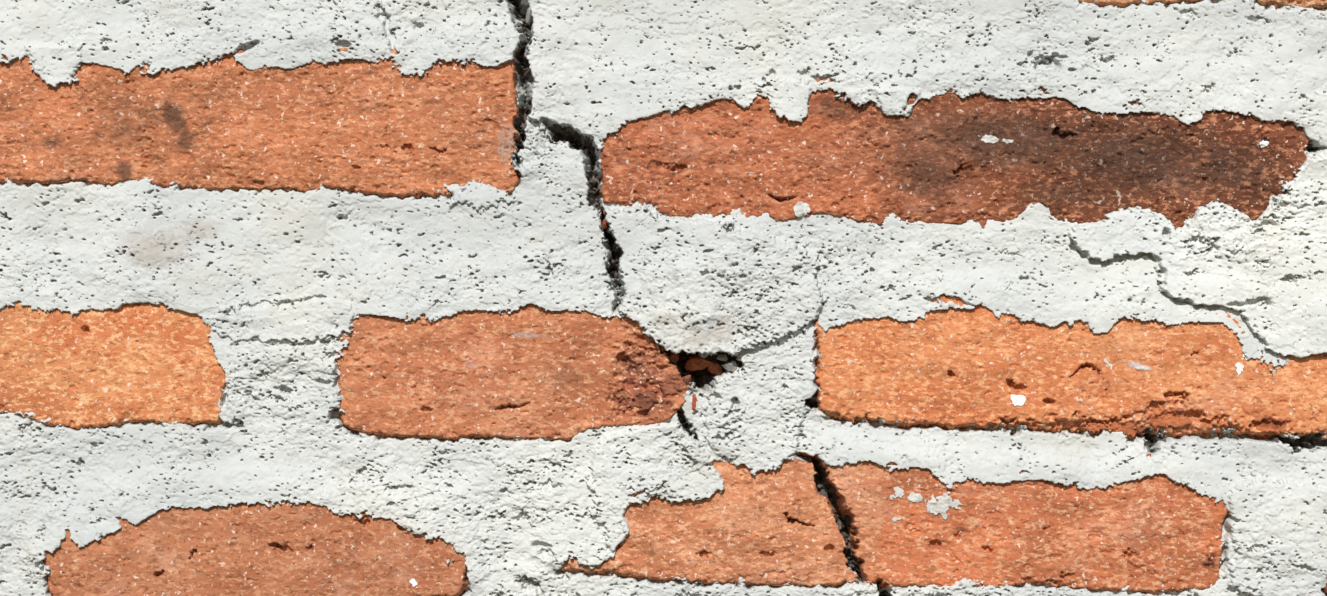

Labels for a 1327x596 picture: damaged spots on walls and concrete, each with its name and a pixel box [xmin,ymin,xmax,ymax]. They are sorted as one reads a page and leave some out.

spalling [1256,0,1327,10]
spalling [597,321,743,426]
spalling [991,392,1292,440]
crack [785,455,896,596]
spalling [1023,574,1075,589]
spalling [1200,546,1222,579]